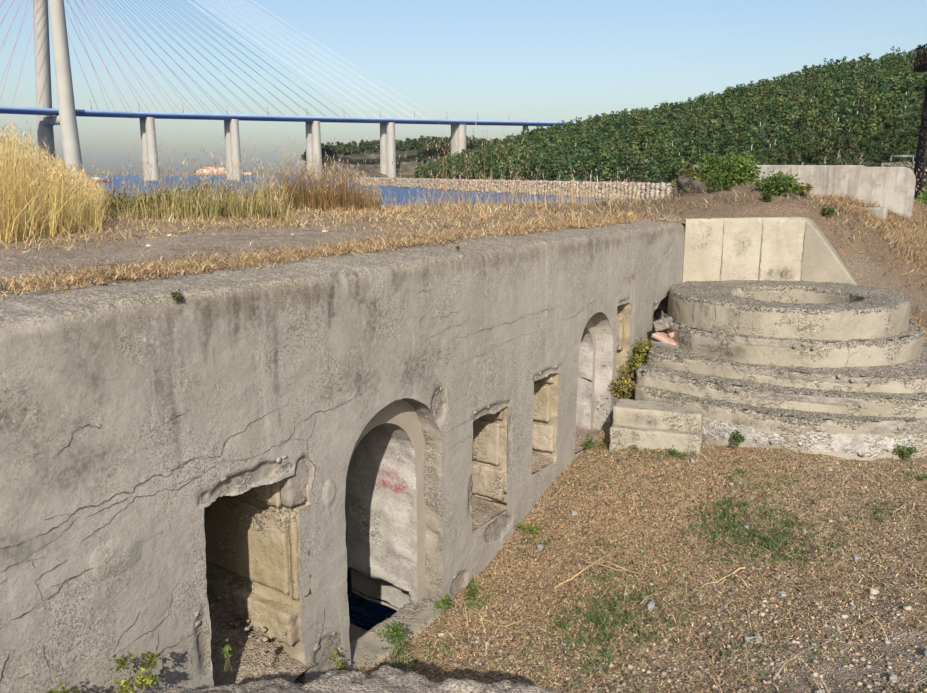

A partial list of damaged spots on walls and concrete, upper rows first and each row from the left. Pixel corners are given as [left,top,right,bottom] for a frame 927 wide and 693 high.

crack [420,296,601,365]
crack [0,384,372,628]
spalling [198,455,313,505]